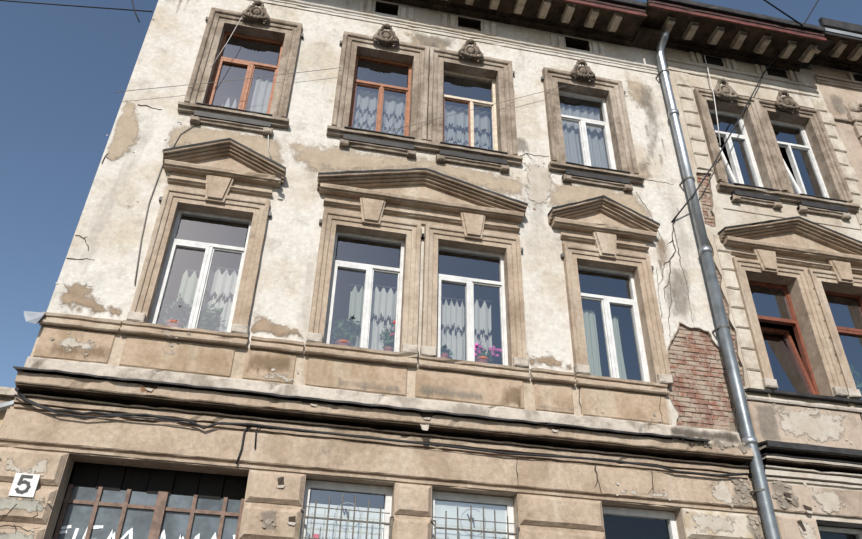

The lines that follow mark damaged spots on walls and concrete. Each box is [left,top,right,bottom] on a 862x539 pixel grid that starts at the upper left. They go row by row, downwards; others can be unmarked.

peeling [106,100,139,160]
flaking render [696,172,716,227]
crack [636,179,694,338]
peeling [56,282,122,316]
peeling [251,309,301,337]
flaking render [708,239,745,386]
flaking render [667,322,750,453]
peeling [773,403,853,444]
flaking render [710,477,766,539]
peeling [772,480,845,539]